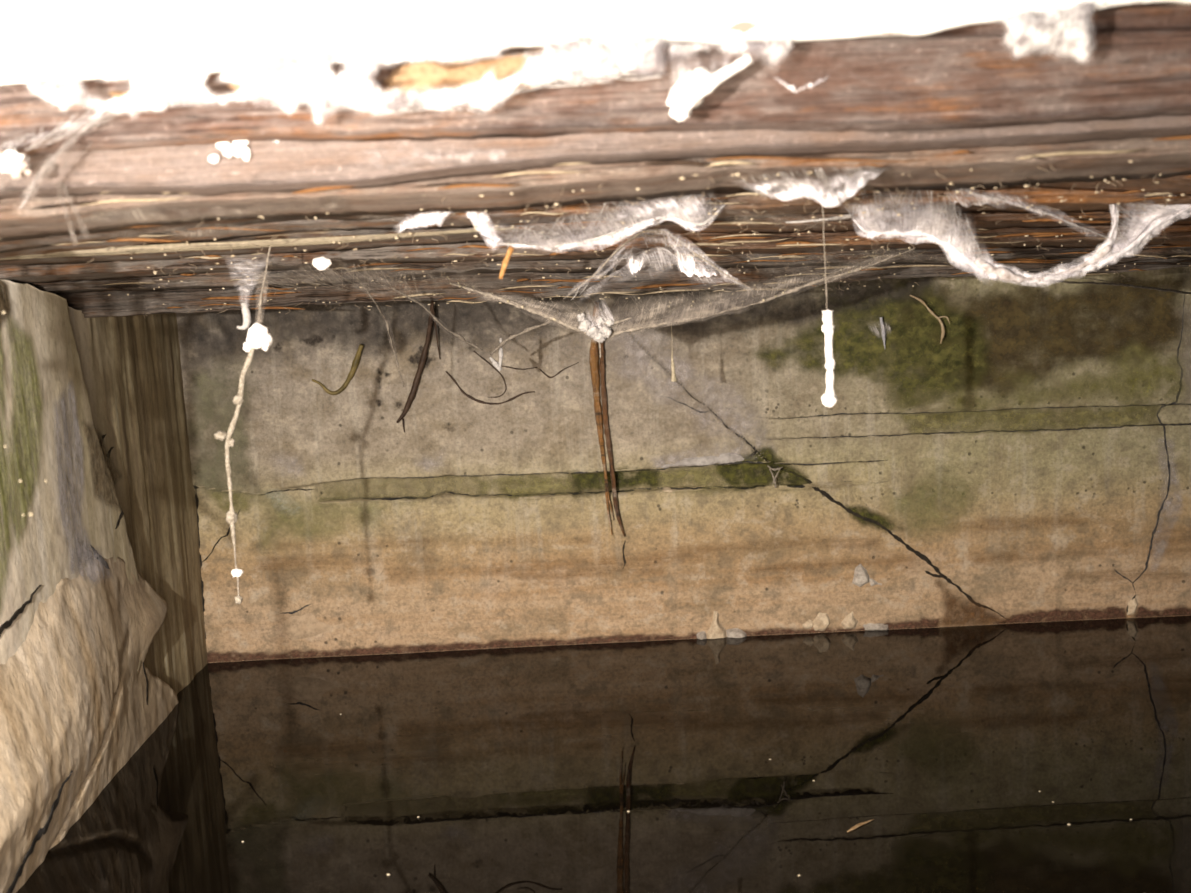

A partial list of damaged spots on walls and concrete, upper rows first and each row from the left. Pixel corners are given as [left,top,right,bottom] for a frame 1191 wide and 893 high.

leakage [615,275,1185,396]
leakage [326,475,575,499]
leakage [655,448,808,493]
crack [647,352,1006,619]
crack [1114,290,1185,612]
crack [0,585,41,636]
leakage [207,611,939,663]
leakage [997,598,1191,624]